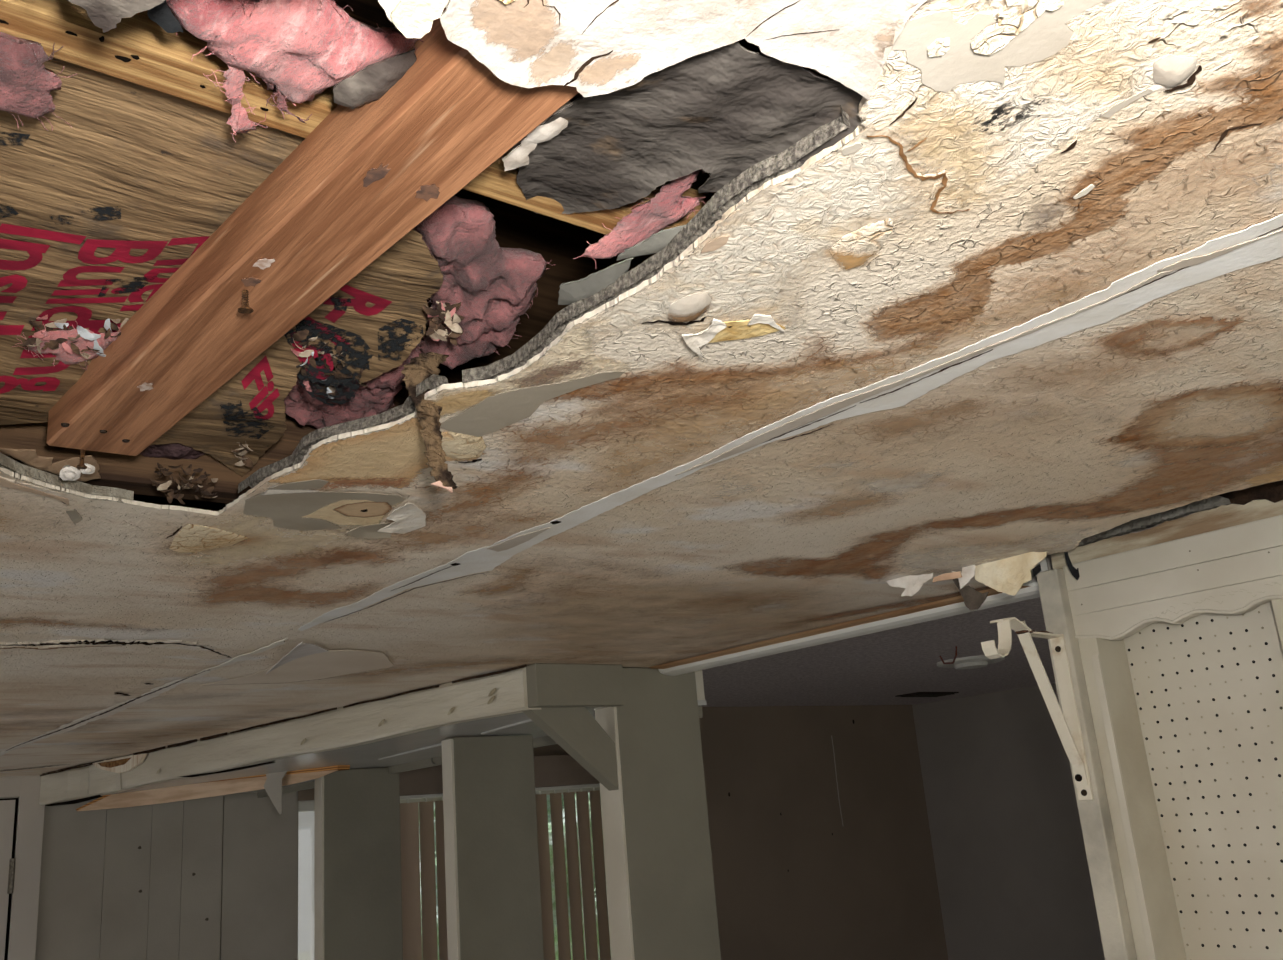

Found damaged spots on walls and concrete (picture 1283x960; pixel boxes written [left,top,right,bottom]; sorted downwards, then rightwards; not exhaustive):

damp [1241,0,1278,18]
crack [865,98,970,214]
crack [642,317,706,325]
peeling [238,0,1202,539]
damp [199,35,1283,608]
crack [1100,266,1190,305]
crack [763,349,993,443]
spalling [0,453,134,524]
damp [777,586,991,630]
peeling [885,573,933,596]
peeling [952,552,1047,610]
crack [0,639,529,776]